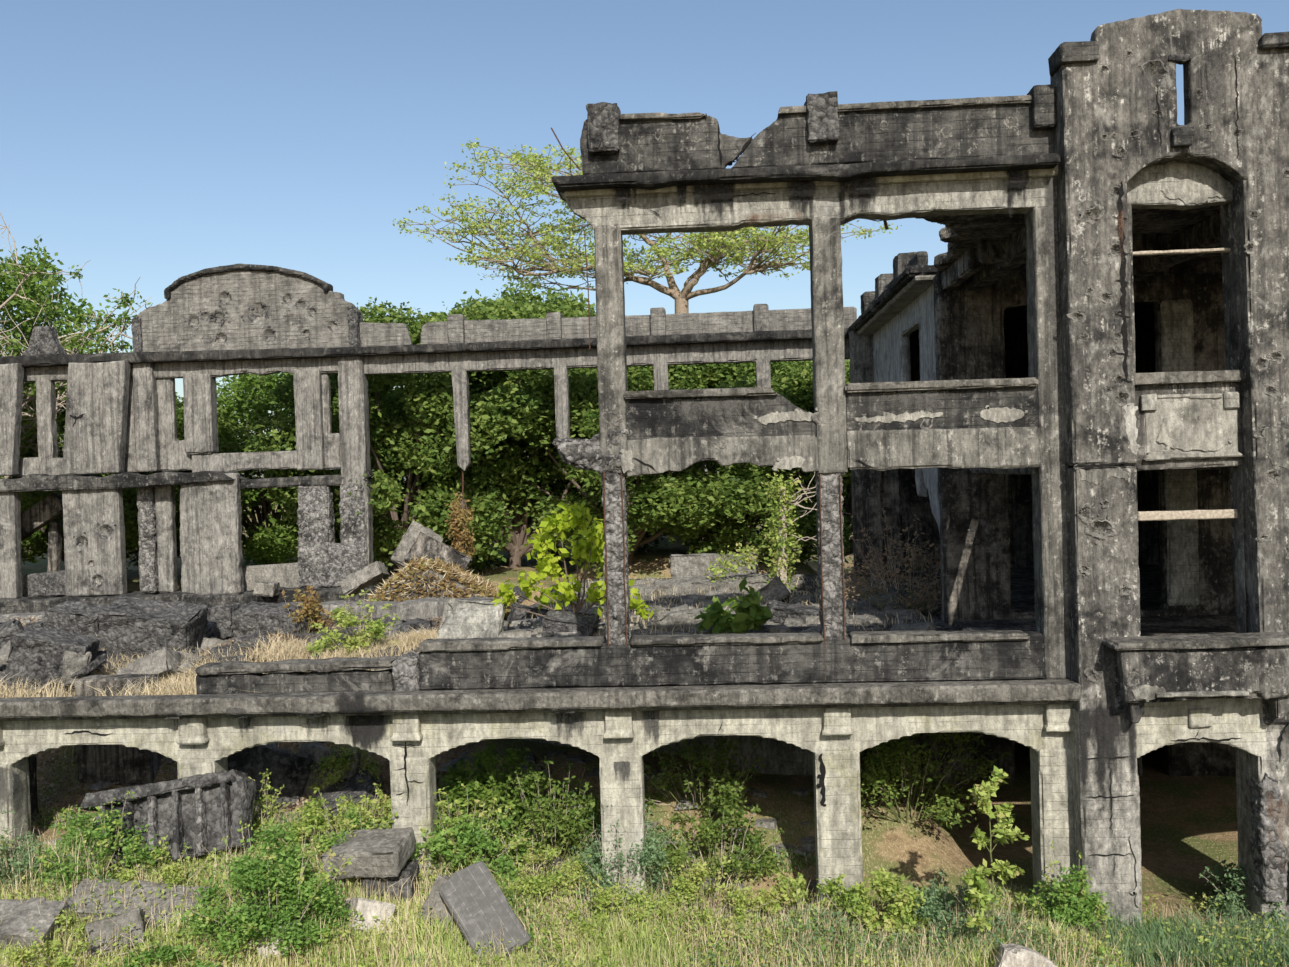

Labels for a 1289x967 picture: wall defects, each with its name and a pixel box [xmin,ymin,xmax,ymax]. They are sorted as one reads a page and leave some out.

crack [717,121,756,166]
spalling [1104,331,1141,456]
peeling [733,406,835,436]
peeling [854,407,943,431]
peeling [980,405,1028,423]
peeling [1157,413,1233,452]
peeling [1073,465,1132,544]
crack [64,726,112,736]
leakage [1079,705,1137,808]